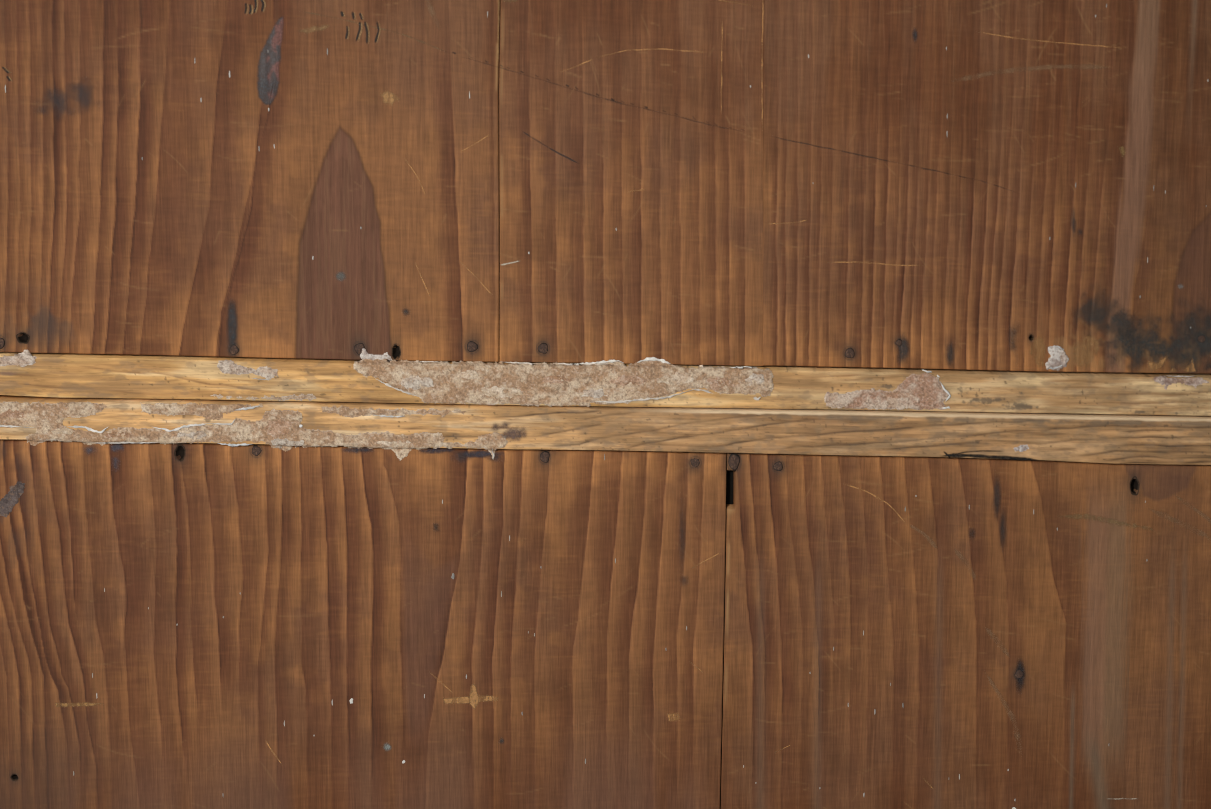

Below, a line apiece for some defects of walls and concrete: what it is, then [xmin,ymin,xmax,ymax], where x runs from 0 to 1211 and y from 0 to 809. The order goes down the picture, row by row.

leakage [1079,300,1211,369]
peeling [0,409,32,428]
peeling [51,361,466,448]
peeling [456,370,523,398]
peeling [558,357,764,403]